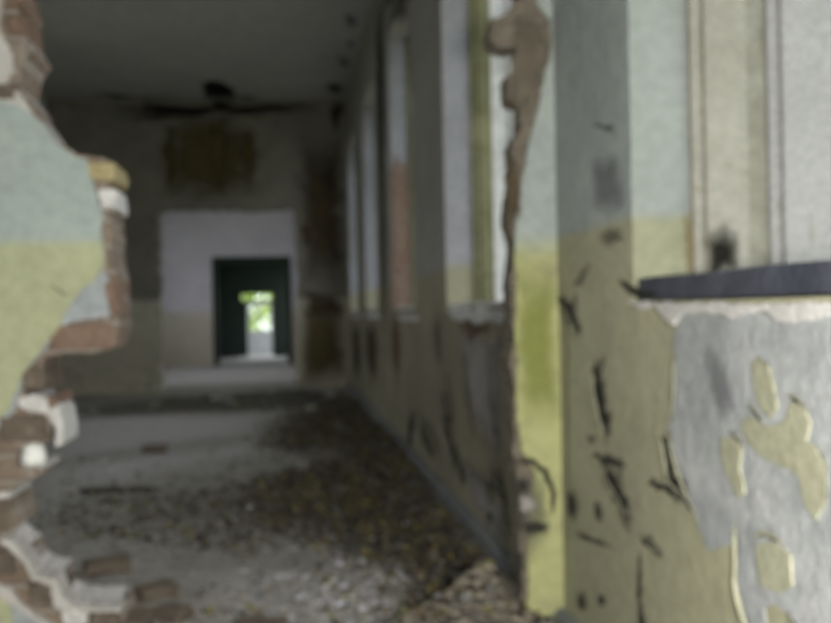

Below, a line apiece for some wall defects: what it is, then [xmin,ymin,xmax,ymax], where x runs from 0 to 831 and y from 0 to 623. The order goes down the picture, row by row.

flaking render [0,83,30,100]
spalling [500,17,546,132]
flaking render [88,161,129,217]
flaking render [49,280,130,350]
flaking render [0,364,75,442]
flaking render [0,480,31,531]
spalling [519,479,547,533]
spalling [520,458,556,511]
peeling [627,300,831,623]
flaking render [0,547,17,575]
flaking render [28,581,53,605]
flaking render [61,553,195,623]